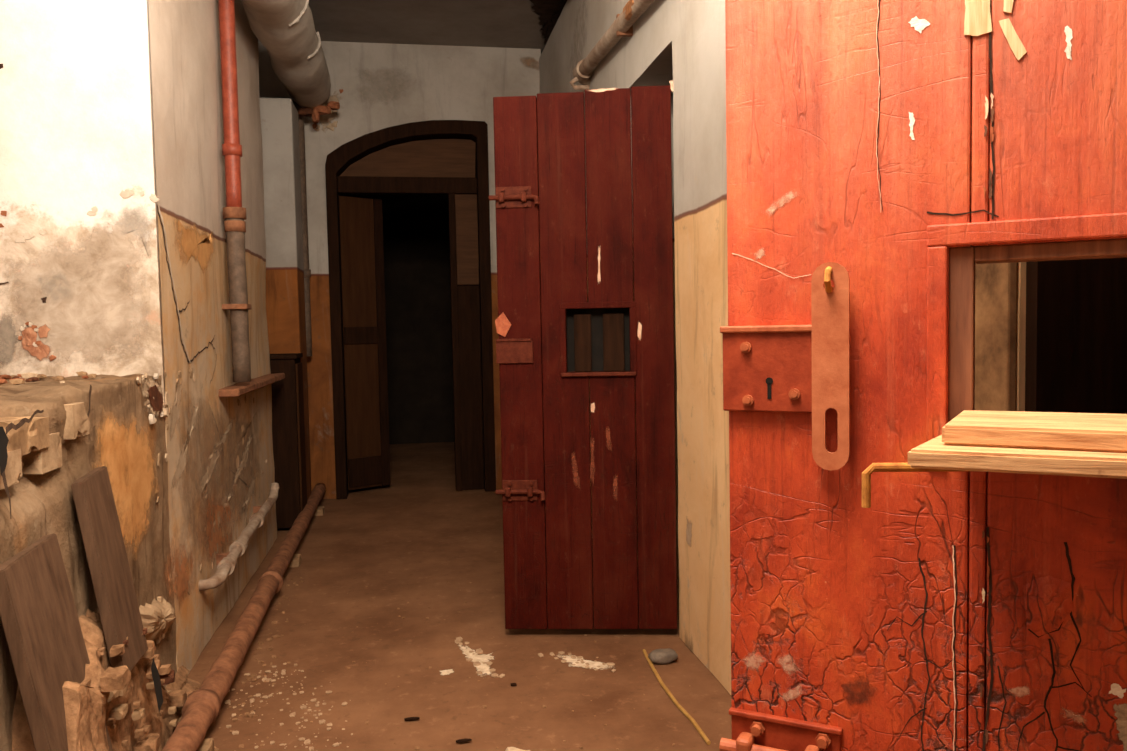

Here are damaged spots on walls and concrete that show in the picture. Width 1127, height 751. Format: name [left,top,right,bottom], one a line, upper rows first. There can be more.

leakage [0,318,18,364]
crack [0,410,44,519]
spalling [0,402,91,490]
peeling [8,189,160,363]
spalling [136,372,168,424]
crack [157,205,217,382]
leakage [157,368,267,540]
crack [887,545,958,751]
crack [997,542,1092,751]
peeling [1109,683,1127,751]